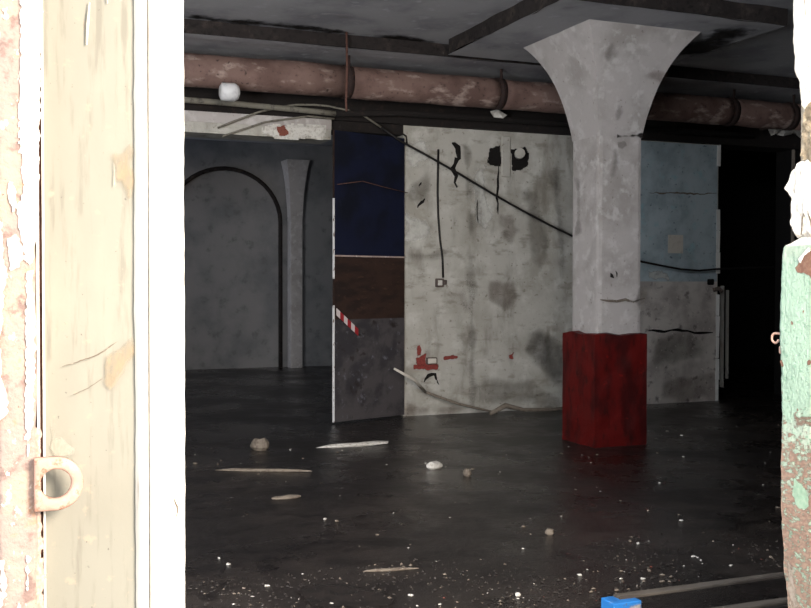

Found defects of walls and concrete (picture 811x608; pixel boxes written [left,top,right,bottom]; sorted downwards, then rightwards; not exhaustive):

spalling [800,102,811,163]
crack [652,189,716,197]
crack [648,327,713,335]
peeling [781,412,811,608]